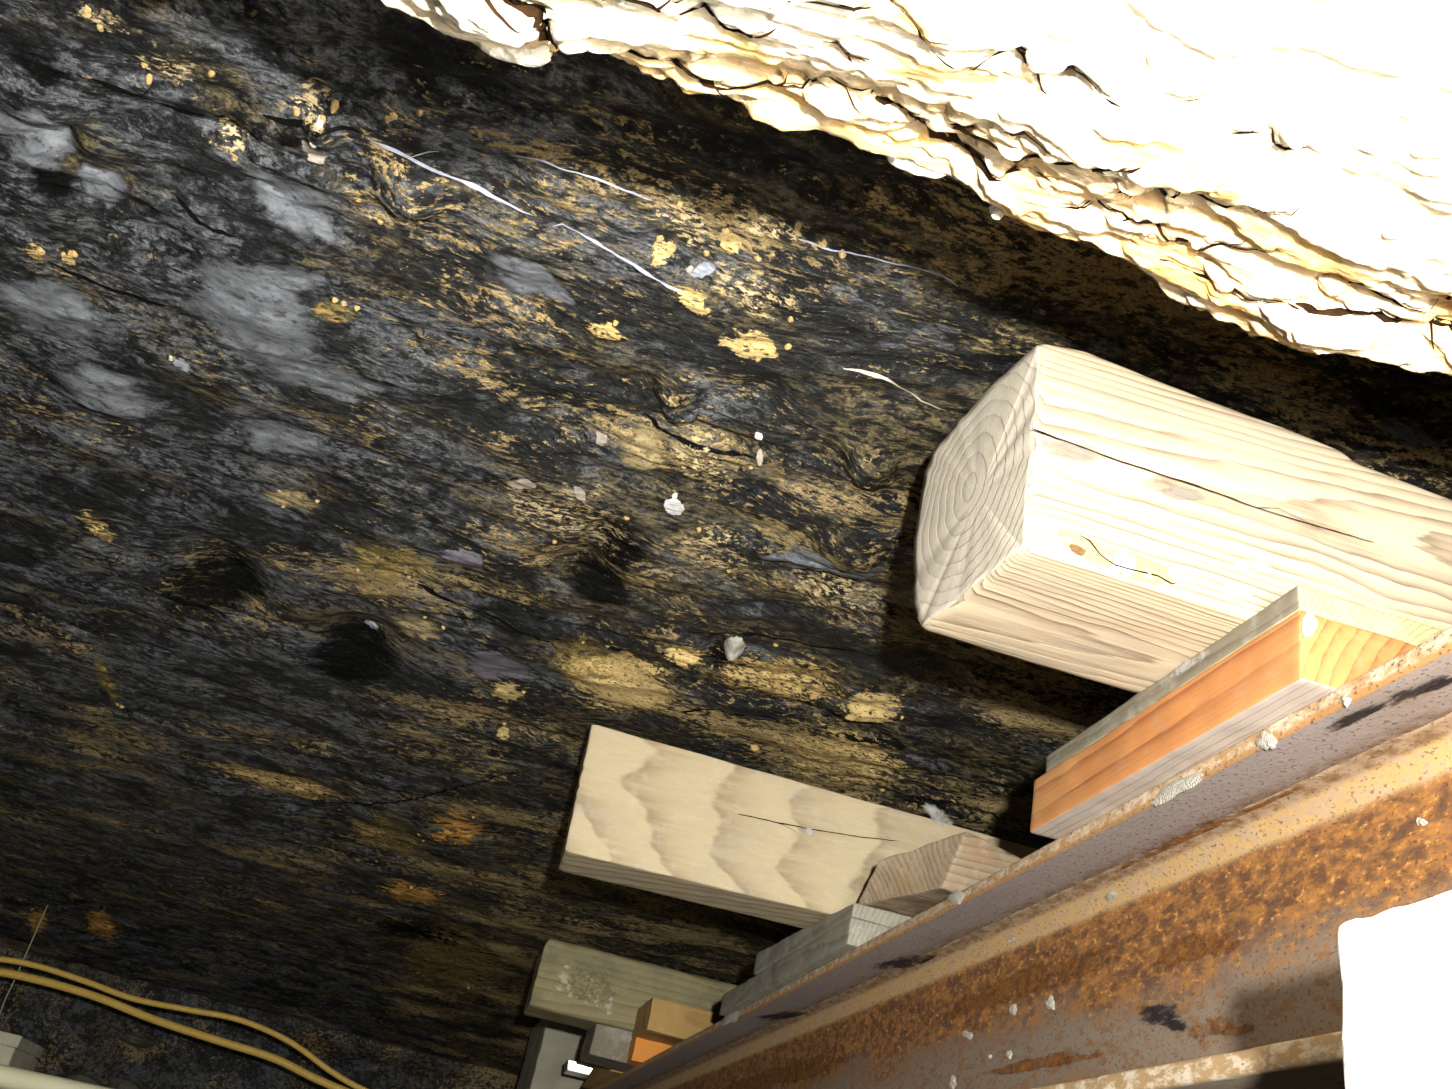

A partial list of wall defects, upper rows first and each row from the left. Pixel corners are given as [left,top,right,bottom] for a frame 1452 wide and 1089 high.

rust [1118,792,1293,872]
rust [1157,932,1239,967]
rust [1190,1017,1254,1039]
rust [992,1051,1101,1074]